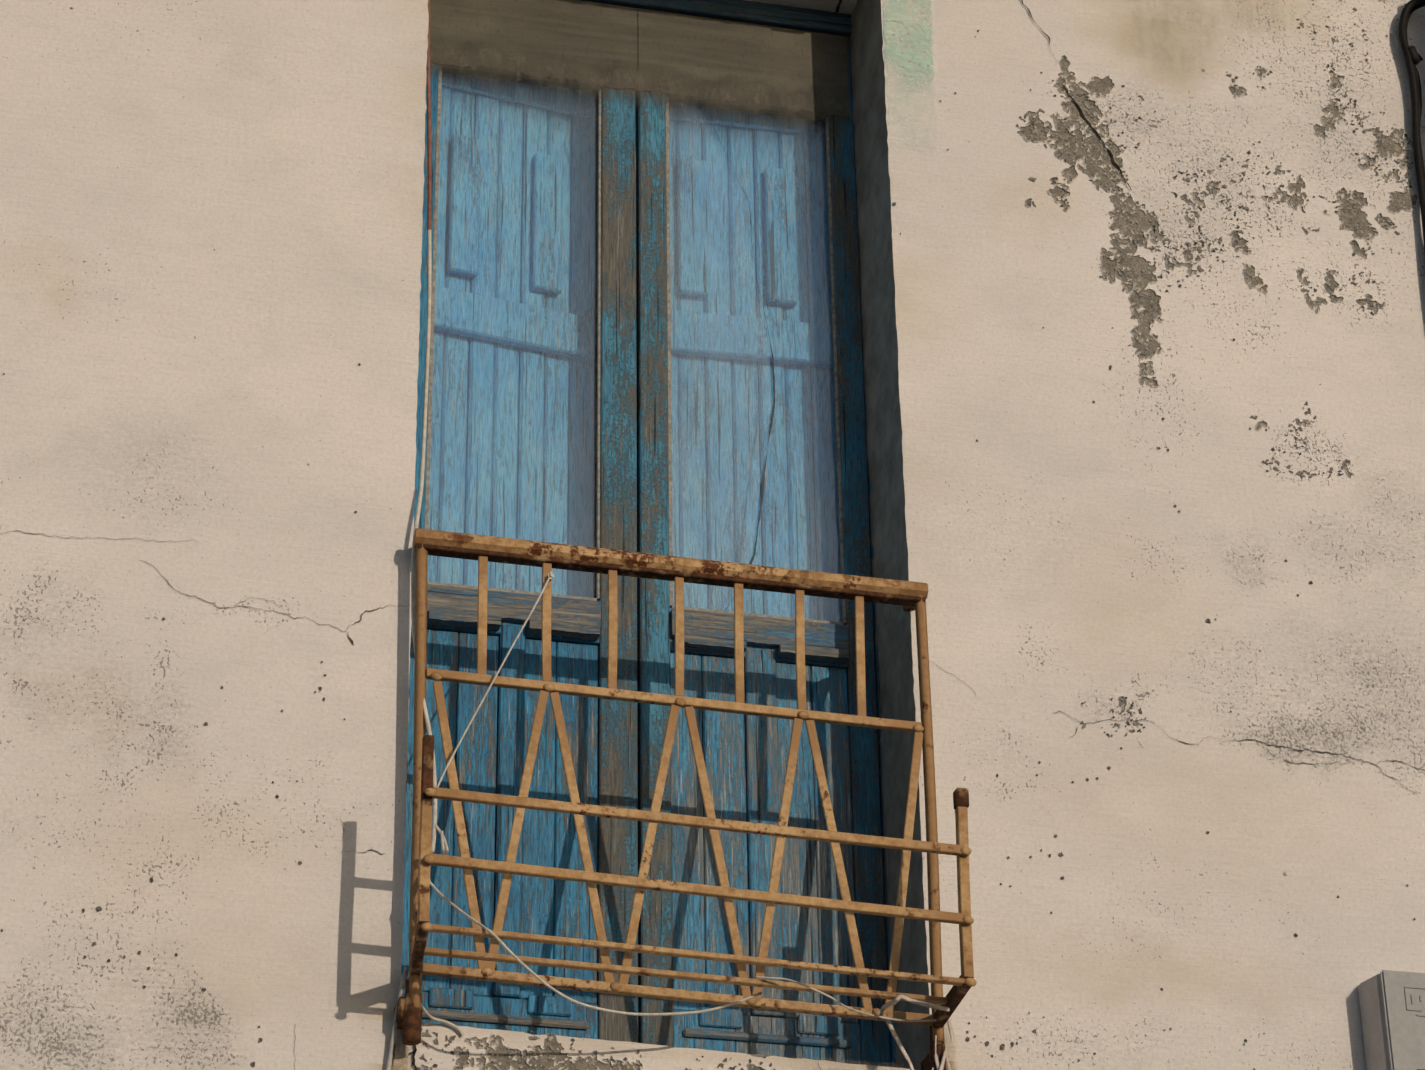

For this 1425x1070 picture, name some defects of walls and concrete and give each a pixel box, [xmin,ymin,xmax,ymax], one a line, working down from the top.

crack [1063,85,1131,190]
peeling [1017,0,1425,388]
peeling [1250,415,1268,431]
peeling [1262,401,1354,480]
crack [0,527,405,645]
crack [1056,711,1424,794]
peeling [414,1028,644,1070]
peeling [685,1056,776,1070]